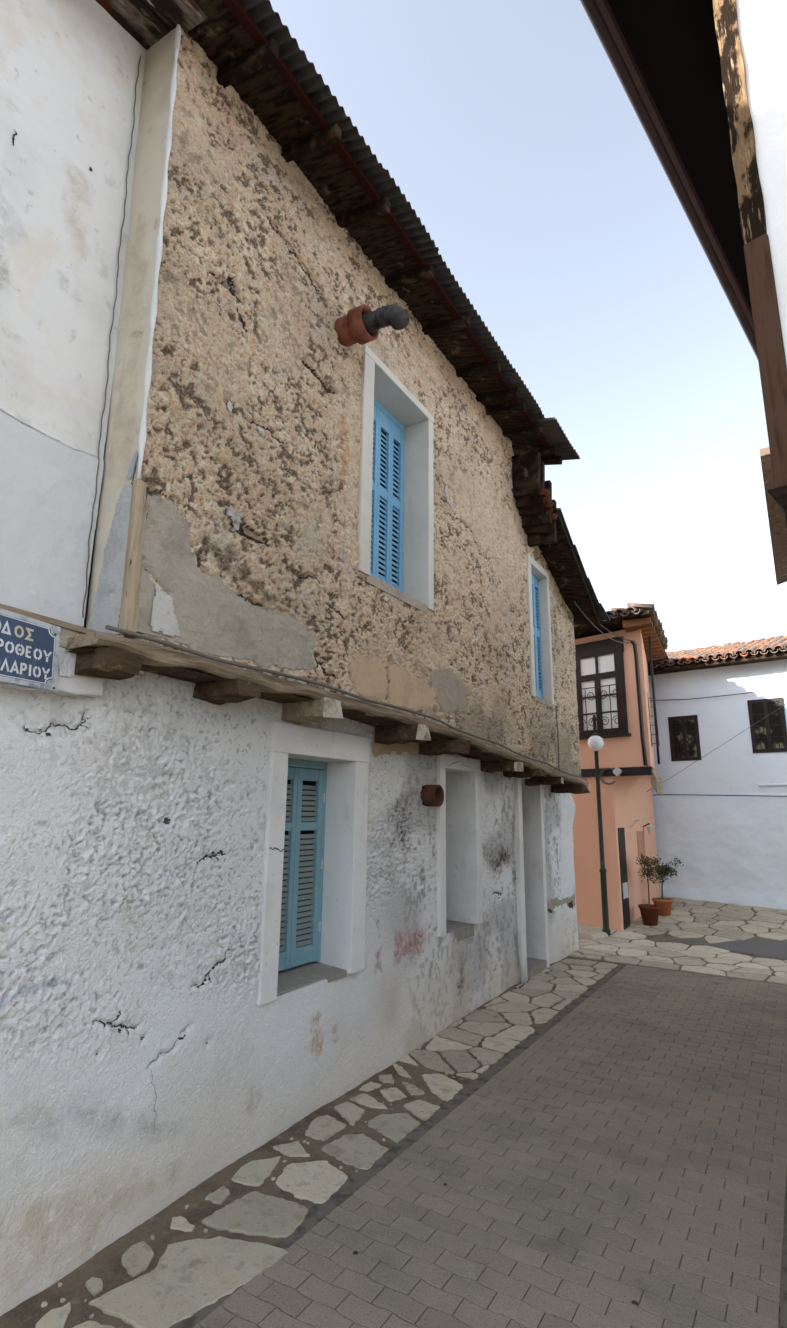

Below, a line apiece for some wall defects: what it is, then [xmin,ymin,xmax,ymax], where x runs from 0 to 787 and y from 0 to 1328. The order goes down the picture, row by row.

spalling [90,449,316,672]
crack [92,1011,139,1035]
crack [148,1031,185,1132]